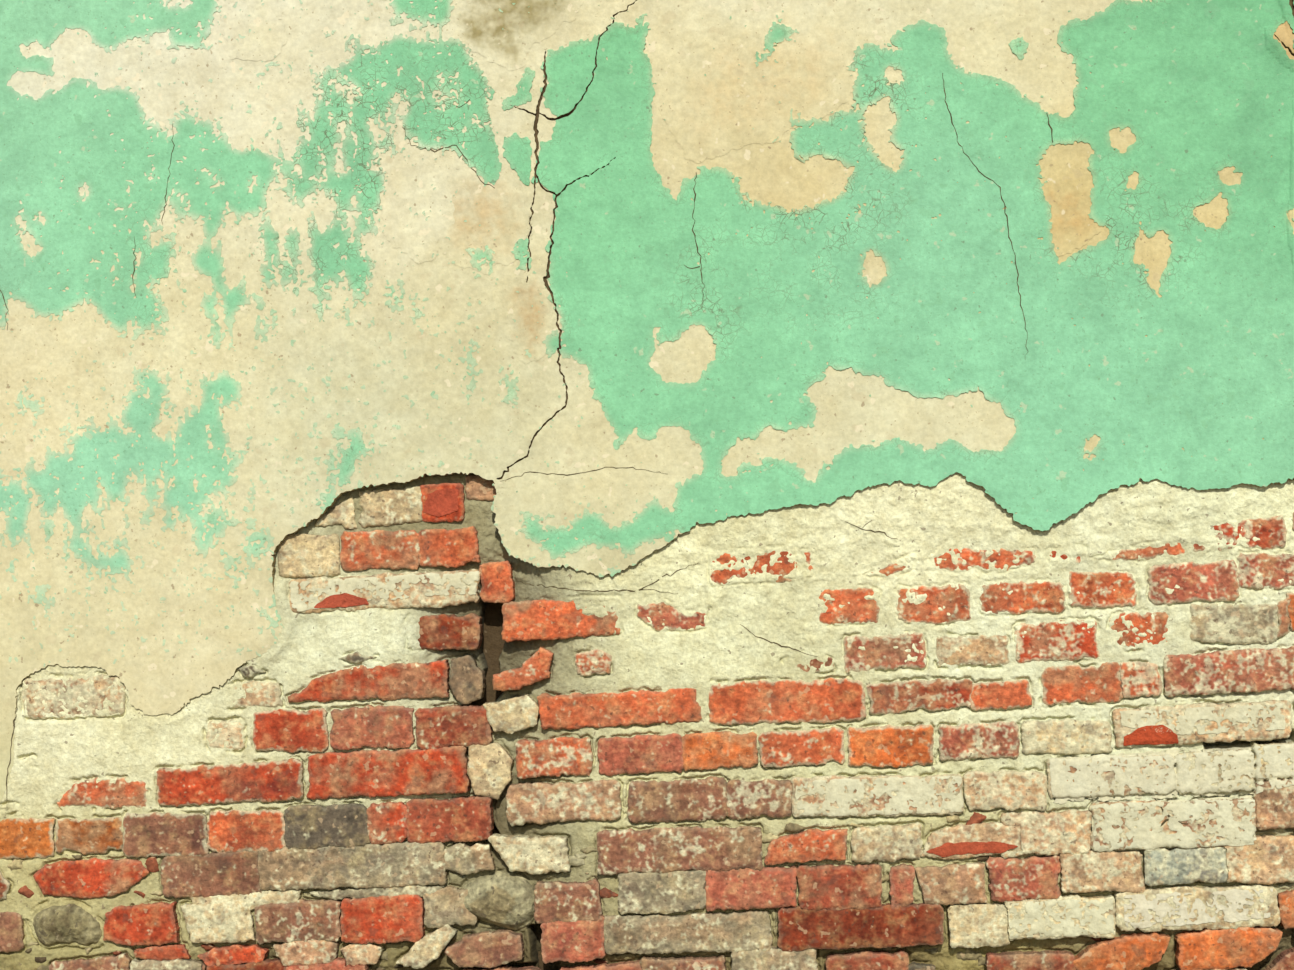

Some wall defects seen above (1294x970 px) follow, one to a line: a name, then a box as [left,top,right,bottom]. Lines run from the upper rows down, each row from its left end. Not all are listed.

peeling [7,0,461,161]
crack [1274,0,1294,56]
crack [419,0,665,481]
crack [684,173,705,306]
peeling [368,0,1294,603]
crack [942,73,1028,353]
peeling [0,171,490,817]
crack [408,606,501,705]
crack [470,780,515,836]
peeling [795,776,964,818]
peeling [1049,703,1294,852]
peeling [1009,888,1273,939]